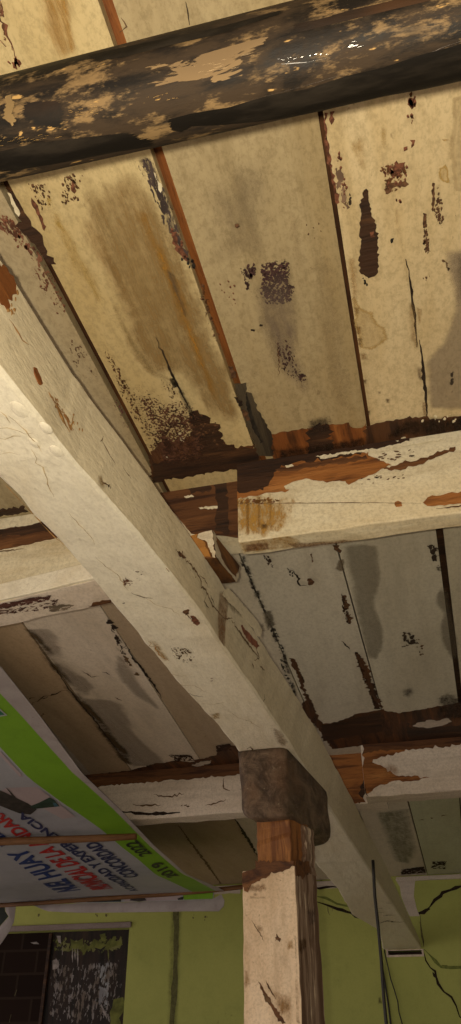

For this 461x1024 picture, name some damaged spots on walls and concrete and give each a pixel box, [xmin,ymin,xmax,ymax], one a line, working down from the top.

peeling [0,1,22,69]
peeling [88,10,283,61]
peeling [146,37,268,100]
peeling [0,94,154,230]
peeling [168,44,461,286]
peeling [0,215,66,314]
damp [92,158,235,417]
peeling [219,259,295,306]
peeling [105,351,461,670]
peeling [289,641,461,804]
crack [418,885,461,1018]